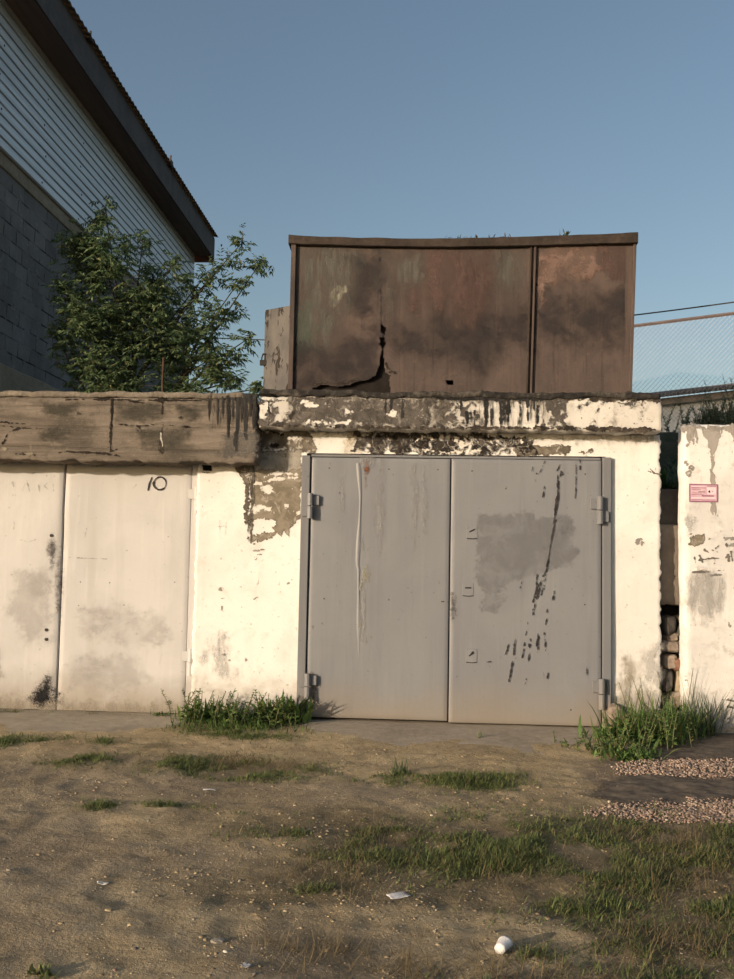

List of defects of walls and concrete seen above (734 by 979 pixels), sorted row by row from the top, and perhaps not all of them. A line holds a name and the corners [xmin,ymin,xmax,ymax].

rust [535,245,625,304]
leakage [126,393,272,458]
flaking render [235,395,563,559]
flaking render [515,438,593,457]
leakage [686,425,734,484]
spalling [688,533,734,549]